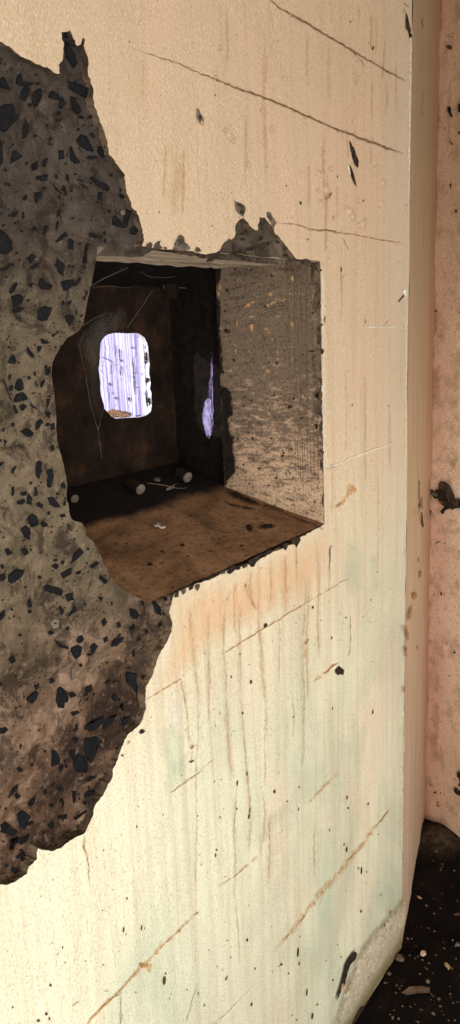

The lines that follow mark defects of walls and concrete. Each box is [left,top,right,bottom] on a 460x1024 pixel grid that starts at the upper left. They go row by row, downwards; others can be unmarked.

crack [271,0,401,79]
crack [150,54,394,151]
crack [286,223,396,249]
spalling [0,33,322,881]
spalling [332,944,368,1024]